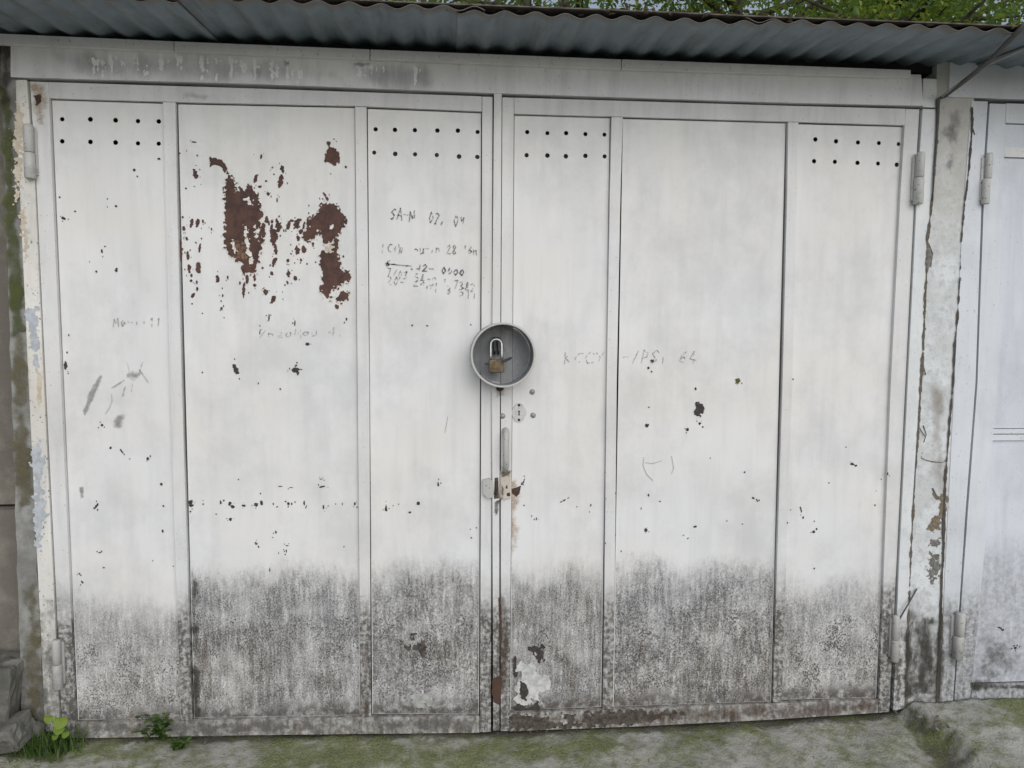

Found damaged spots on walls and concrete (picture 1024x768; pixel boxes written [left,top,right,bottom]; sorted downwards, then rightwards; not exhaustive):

peeling [28,437,50,552]
spalling [215,486,307,521]
corrosion [495,471,525,537]
spalling [927,492,949,585]
water stain [75,577,360,719]
water stain [372,574,479,714]
peeling [513,644,559,711]
water stain [511,574,602,710]
water stain [614,563,879,706]